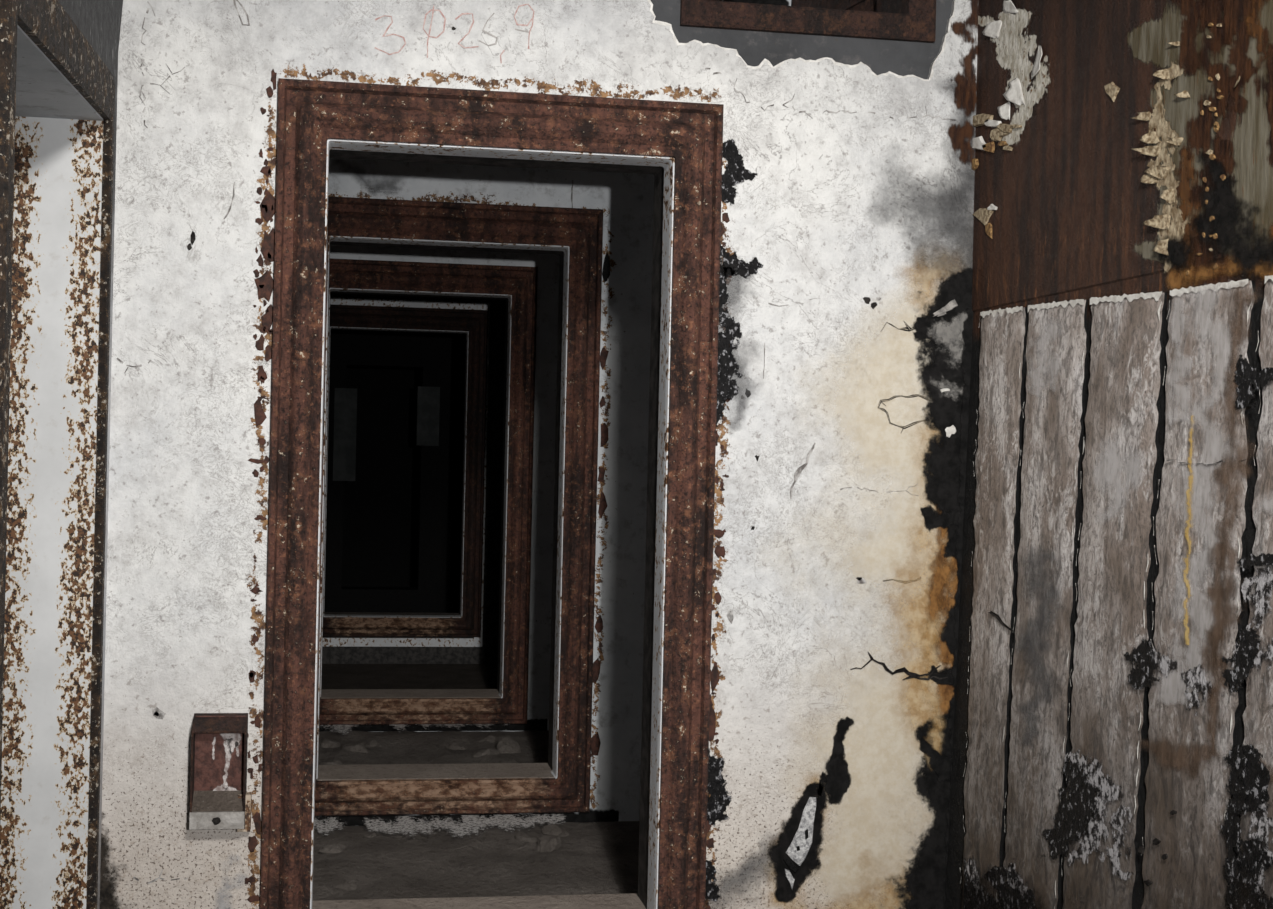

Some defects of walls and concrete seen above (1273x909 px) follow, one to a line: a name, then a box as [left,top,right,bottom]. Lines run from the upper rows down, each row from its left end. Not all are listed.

rust [280,63,721,102]
spalling [648,0,957,81]
peeling [972,0,1273,324]
crack [878,394,930,433]
rust [246,297,273,909]
peeling [713,529,726,574]
rust [710,404,731,758]
damp [919,306,973,783]
damp [1124,290,1273,909]
peeling [709,662,719,744]
crack [850,652,947,680]
damp [1042,761,1103,860]